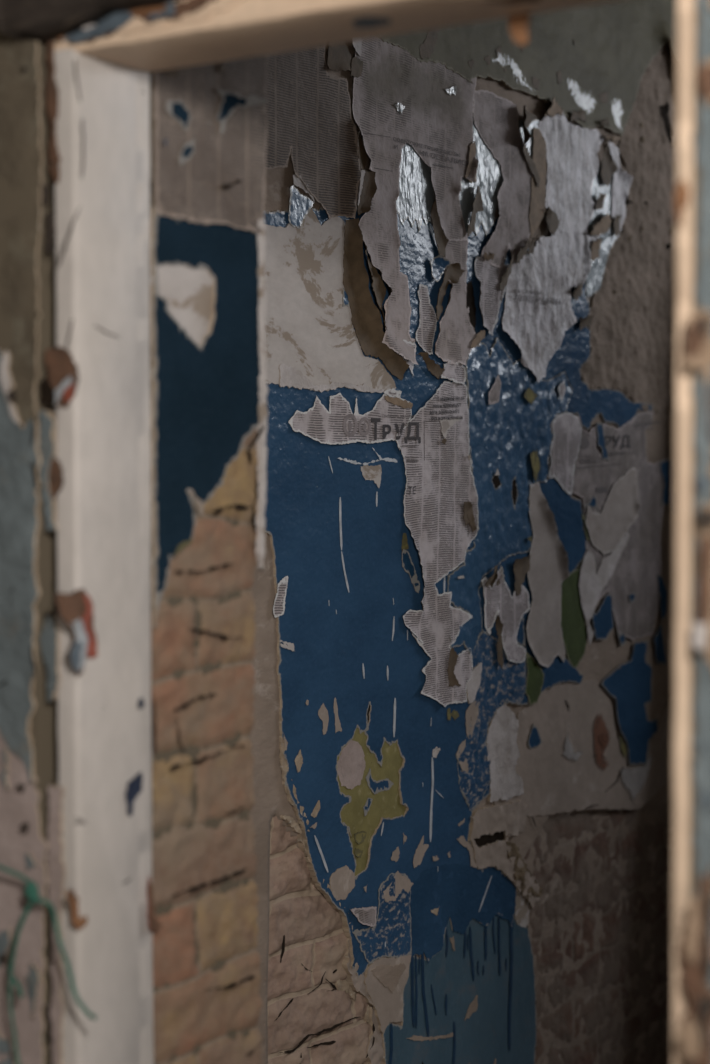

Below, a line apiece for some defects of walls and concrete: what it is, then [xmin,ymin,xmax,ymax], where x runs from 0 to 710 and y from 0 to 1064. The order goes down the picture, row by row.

peeling [0,32,55,1064]
spalling [58,0,215,43]
peeling [166,100,195,167]
peeling [205,88,268,134]
peeling [150,206,673,1064]
flaking render [351,0,710,897]